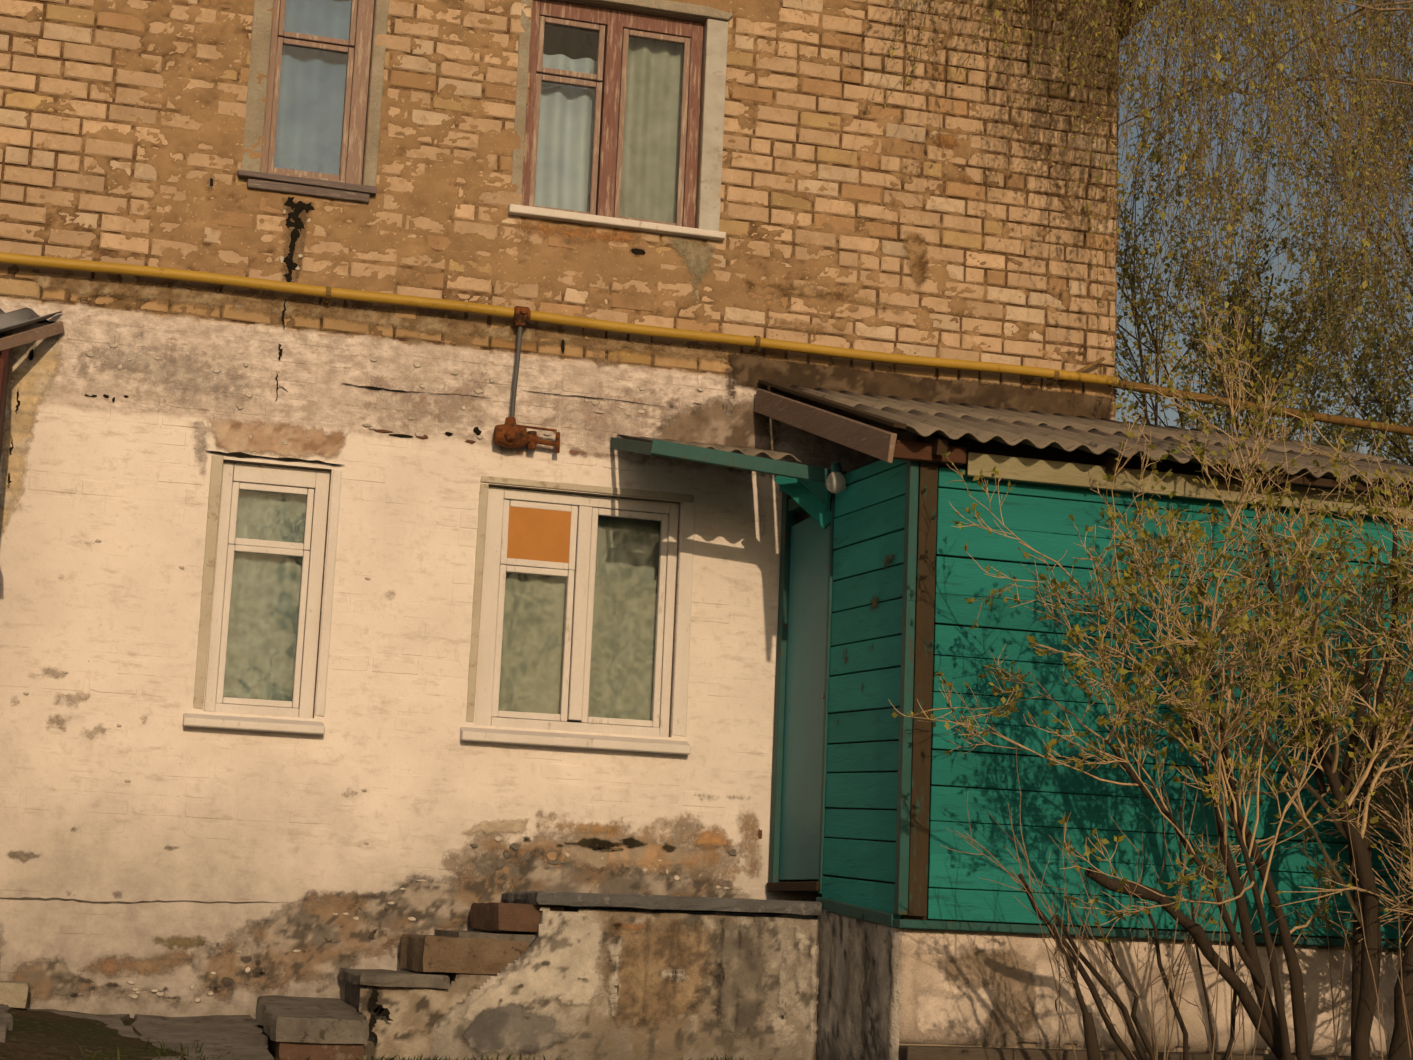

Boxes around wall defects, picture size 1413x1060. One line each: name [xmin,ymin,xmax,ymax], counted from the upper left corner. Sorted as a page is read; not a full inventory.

spalling [904,233,928,285]
spalling [744,279,904,314]
peeling [362,359,495,443]
peeling [0,320,345,533]
peeling [49,694,90,729]
crack [8,851,37,862]
crack [0,892,280,904]
spalling [13,811,762,1055]
peeling [918,936,954,954]
peeling [915,991,975,1033]
peeling [1040,971,1076,1034]